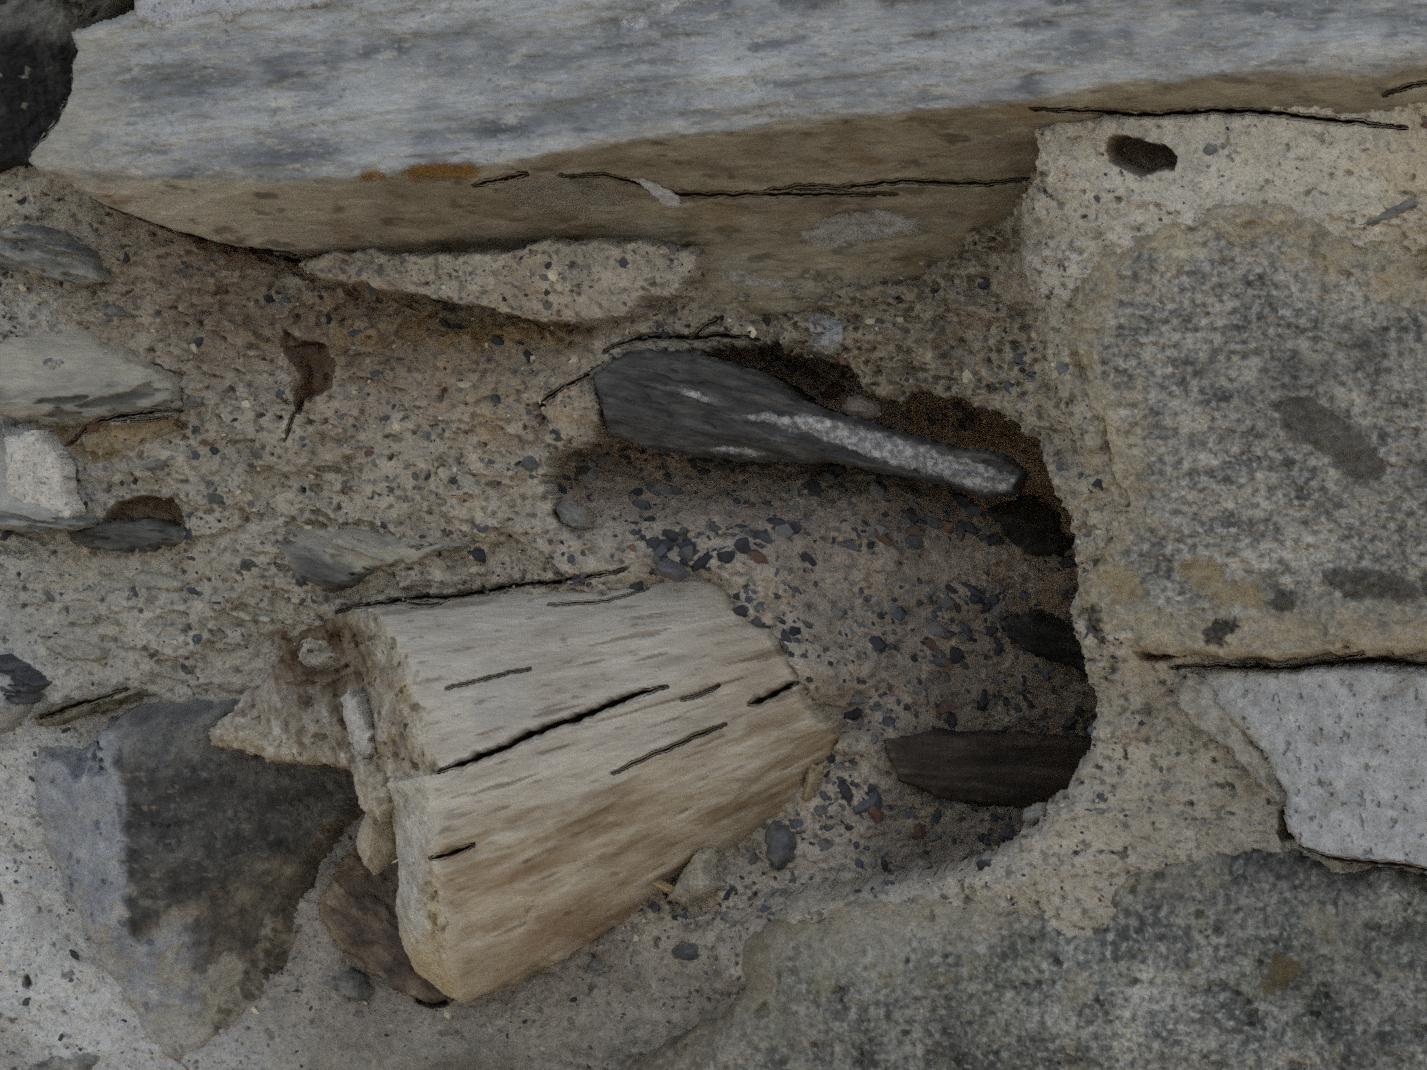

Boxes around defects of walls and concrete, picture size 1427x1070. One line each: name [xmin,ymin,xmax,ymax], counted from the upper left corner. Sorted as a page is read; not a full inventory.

crack [472,172,1030,199]
crack [334,567,651,614]
spalling [765,819,797,871]